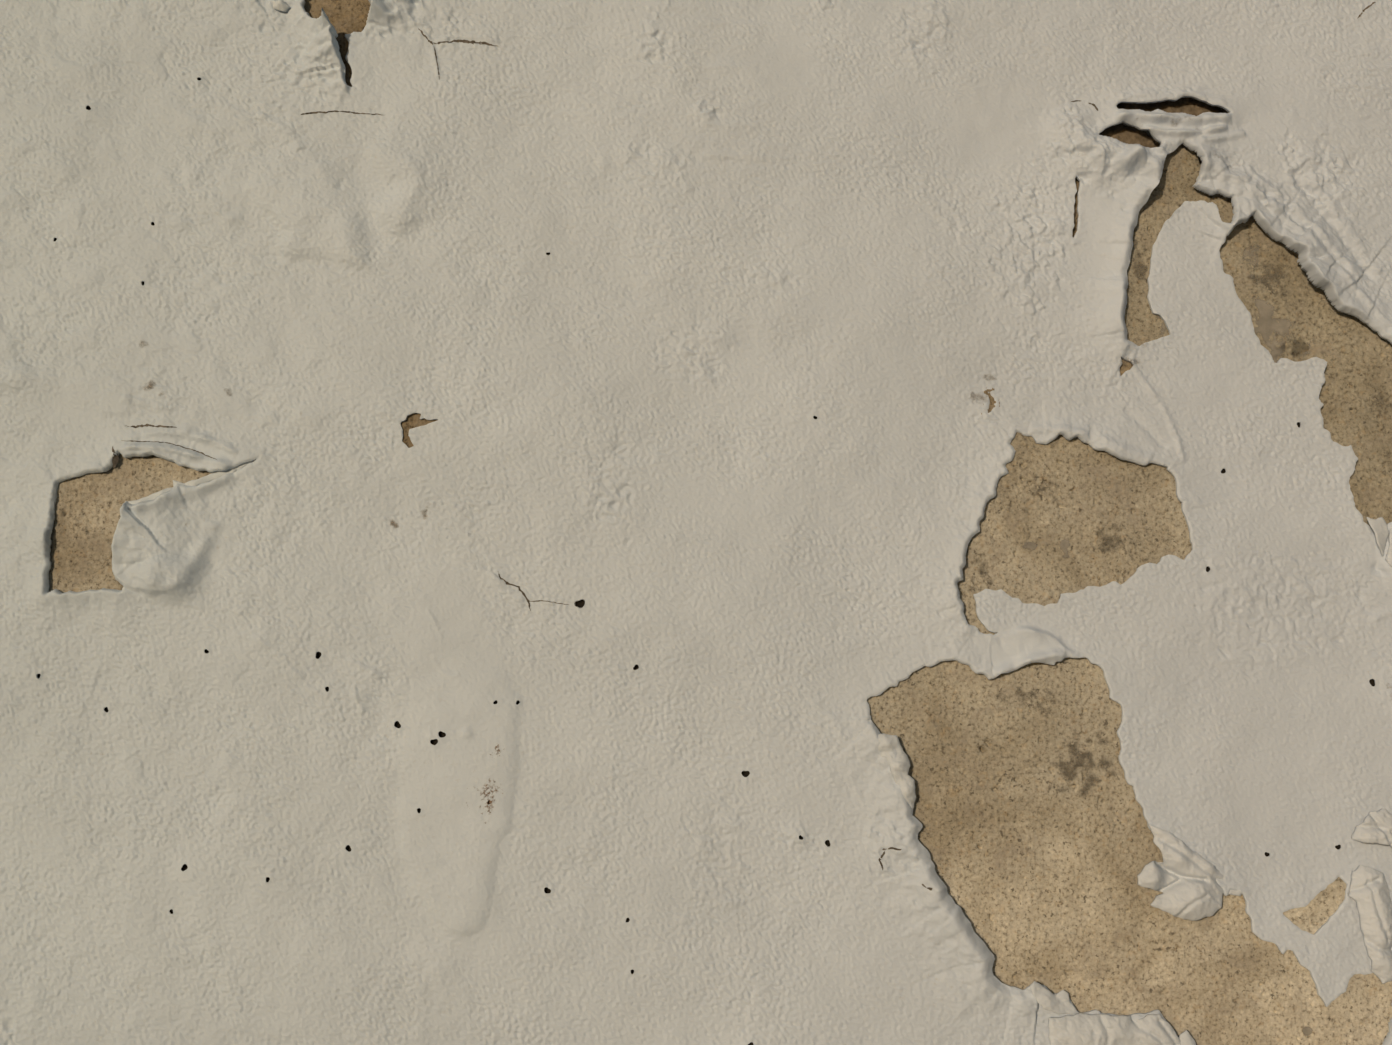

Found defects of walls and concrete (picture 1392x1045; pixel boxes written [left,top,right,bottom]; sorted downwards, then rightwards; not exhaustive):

peeling [271,0,407,120]
peeling [14,422,291,622]
peeling [824,384,1392,1045]
peeling [1092,128,1392,594]